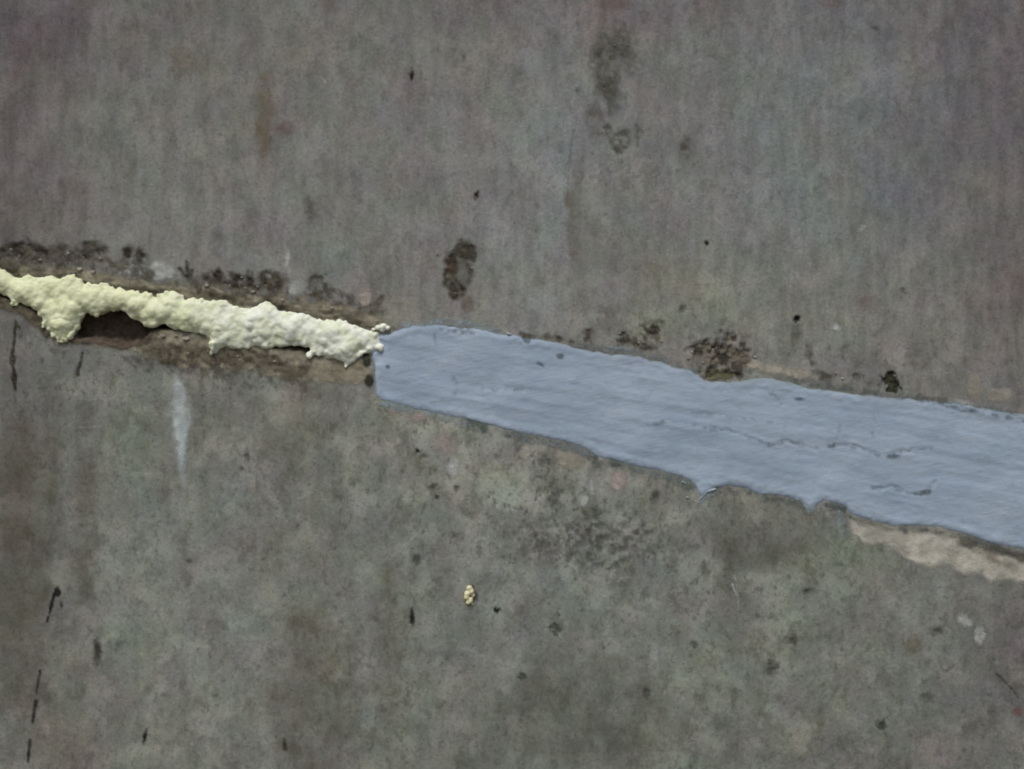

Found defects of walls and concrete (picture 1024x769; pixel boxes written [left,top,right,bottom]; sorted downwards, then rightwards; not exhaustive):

spalling [1,242,107,269]
spalling [122,246,144,267]
spalling [179,262,285,296]
spalling [436,242,476,307]
crack [0,246,391,391]
spalling [687,334,757,381]
damp [171,379,191,463]